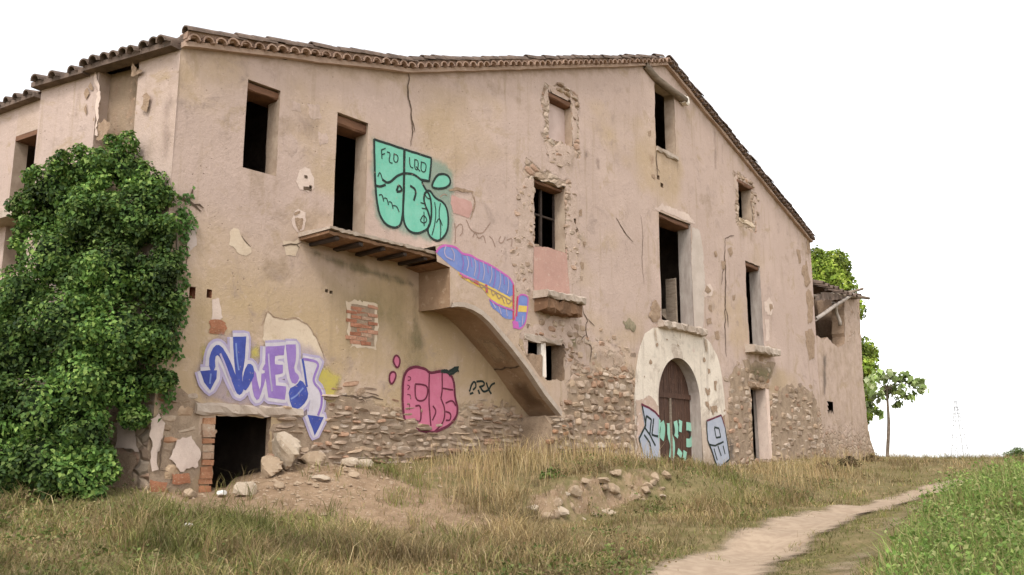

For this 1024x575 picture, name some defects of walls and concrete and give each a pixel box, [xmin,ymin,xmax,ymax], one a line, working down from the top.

flaking render [84,72,110,141]
crack [407,74,415,141]
peeling [543,82,580,168]
flaking render [291,209,306,232]
flaking render [296,167,314,192]
flaking render [449,187,475,220]
peeling [510,178,536,297]
peeling [563,184,586,284]
flaking render [345,299,379,350]
peeling [110,387,202,492]
peeling [519,312,659,459]
peeling [693,349,825,462]